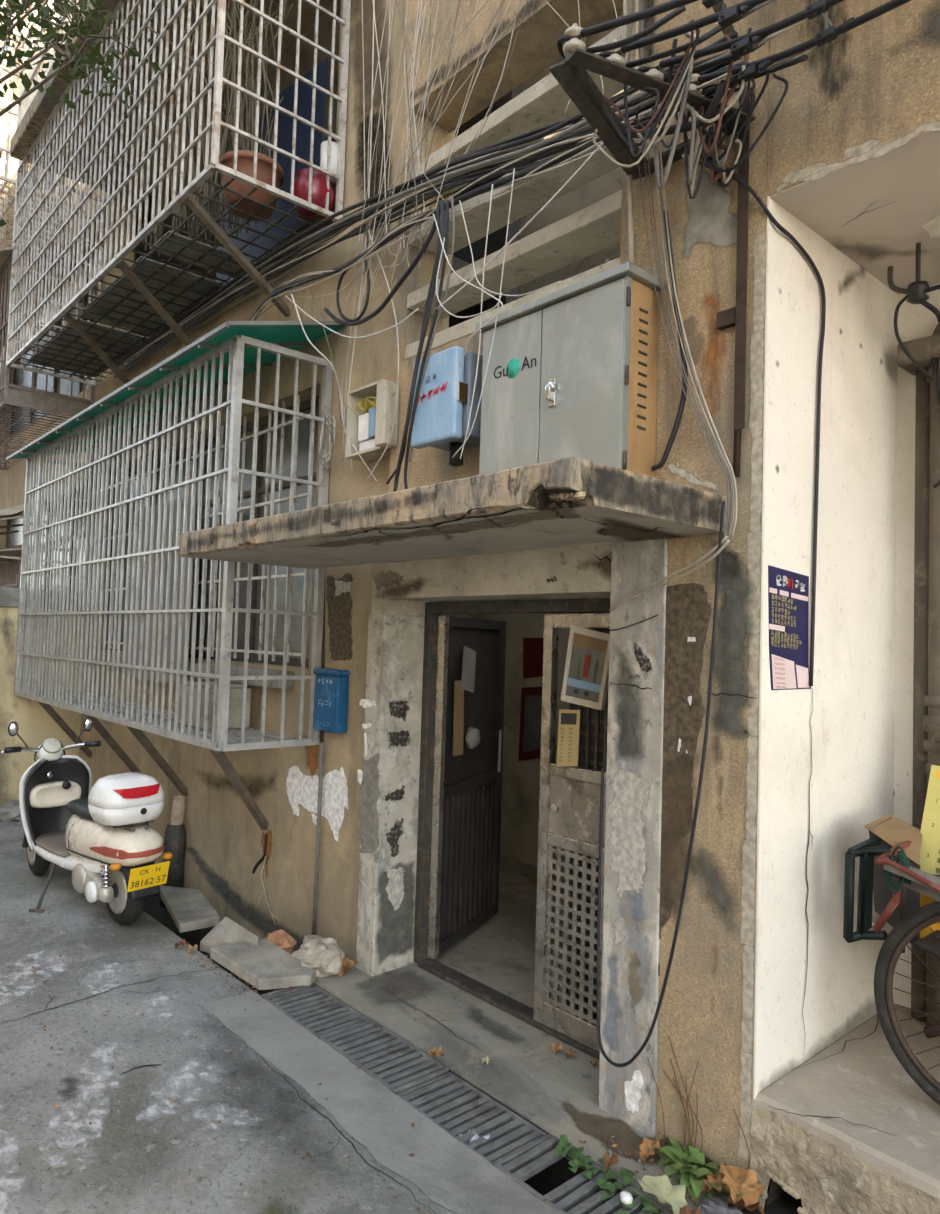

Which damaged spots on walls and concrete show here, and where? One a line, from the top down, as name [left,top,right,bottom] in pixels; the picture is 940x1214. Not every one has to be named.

water stain [187,492,436,551]
peeling [309,484,588,547]
peeling [359,699,376,708]
water stain [660,231,779,1161]
flaking render [607,583,712,939]
peeling [357,723,405,911]
crack [793,688,897,1070]
peeling [628,953,660,1007]
peeling [624,1069,644,1115]